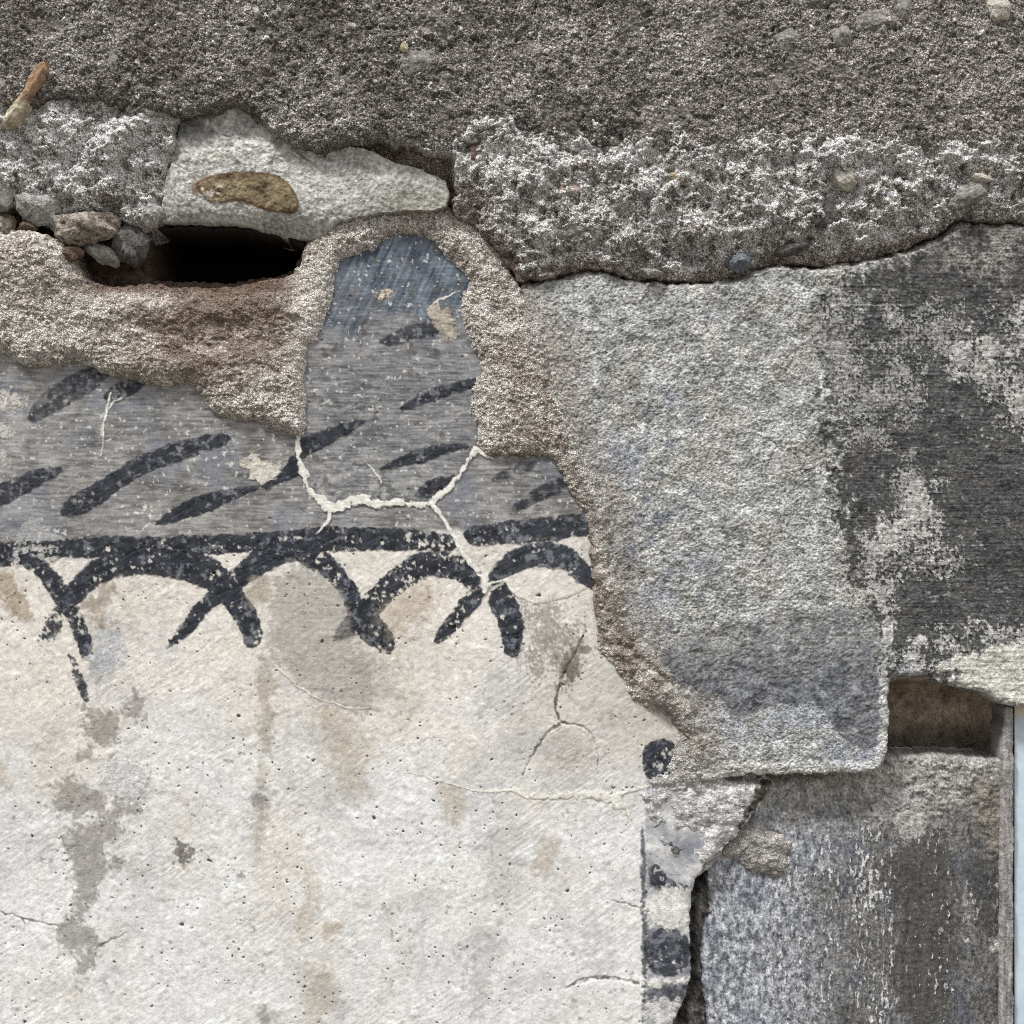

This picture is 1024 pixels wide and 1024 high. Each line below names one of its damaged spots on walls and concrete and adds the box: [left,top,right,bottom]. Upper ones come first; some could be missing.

spalling [75,226,306,287]
spalling [426,302,460,342]
peeling [0,386,32,466]
crack [295,436,587,615]
crack [534,670,580,753]